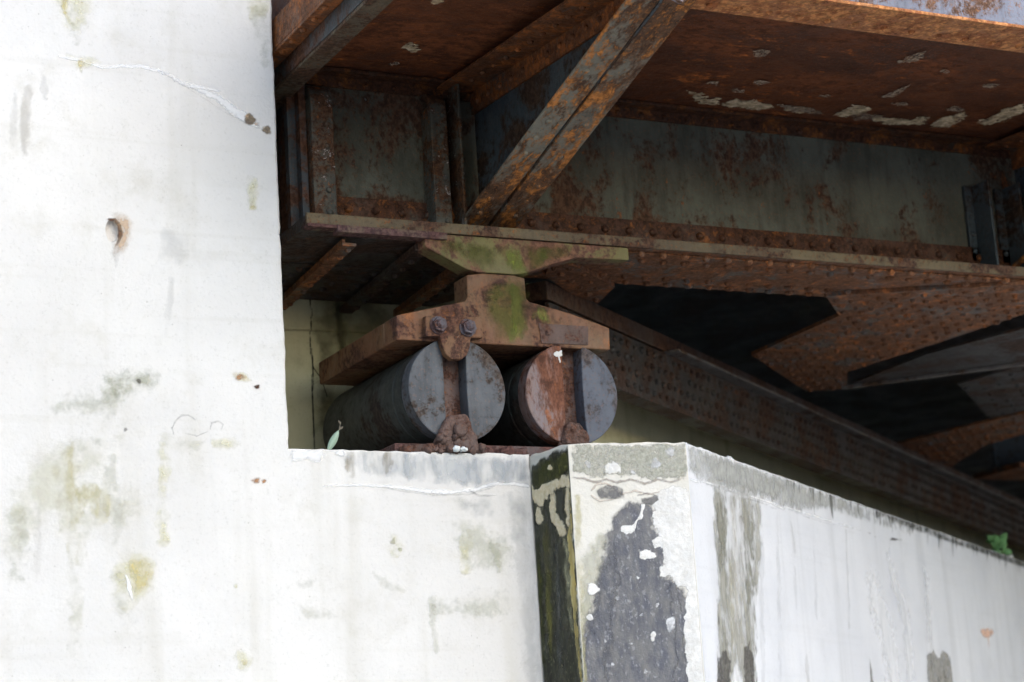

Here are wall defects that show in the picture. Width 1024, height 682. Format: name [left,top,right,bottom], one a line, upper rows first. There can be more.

crack [59,55,258,127]
peeling [686,81,821,115]
peeling [836,86,1024,127]
spalling [105,218,129,247]
corrosion [424,431,486,455]
peeling [577,478,704,682]
water stain [532,443,1020,682]